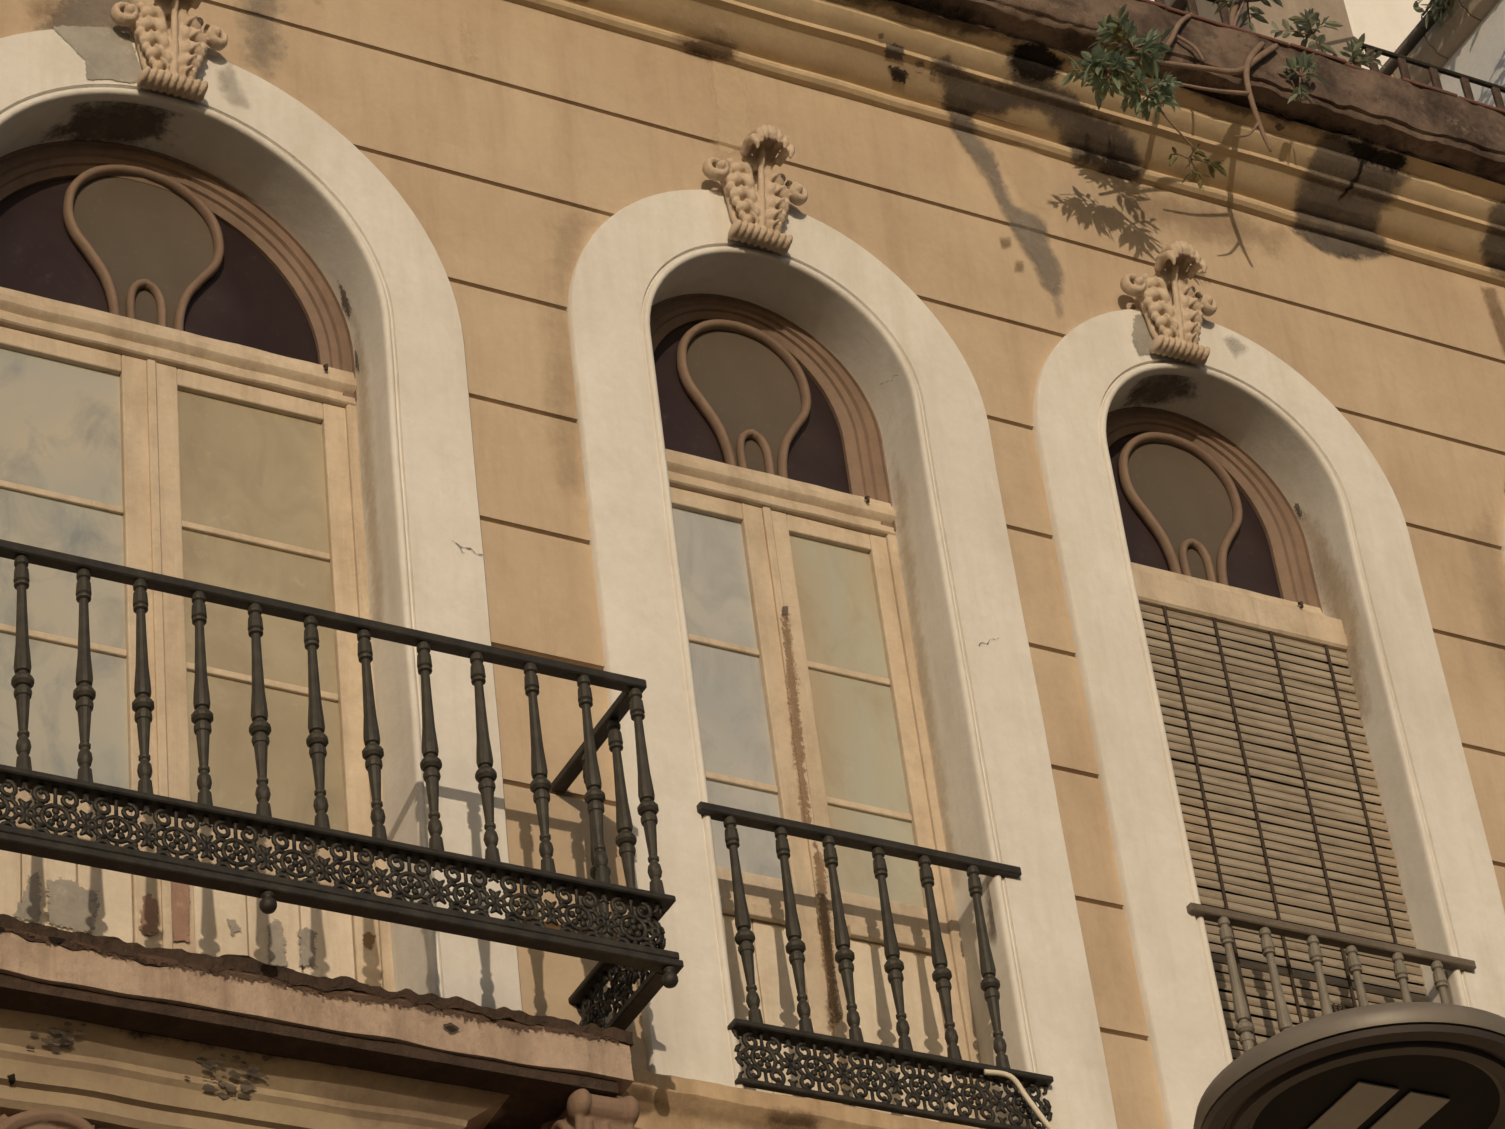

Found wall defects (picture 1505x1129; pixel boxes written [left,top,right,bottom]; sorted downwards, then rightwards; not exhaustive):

peeling [53,25,142,83]
water stain [42,101,175,142]
water stain [848,0,992,35]
water stain [934,41,1142,292]
water stain [1189,88,1410,259]
water stain [1480,202,1505,346]
spalling [0,869,634,1053]